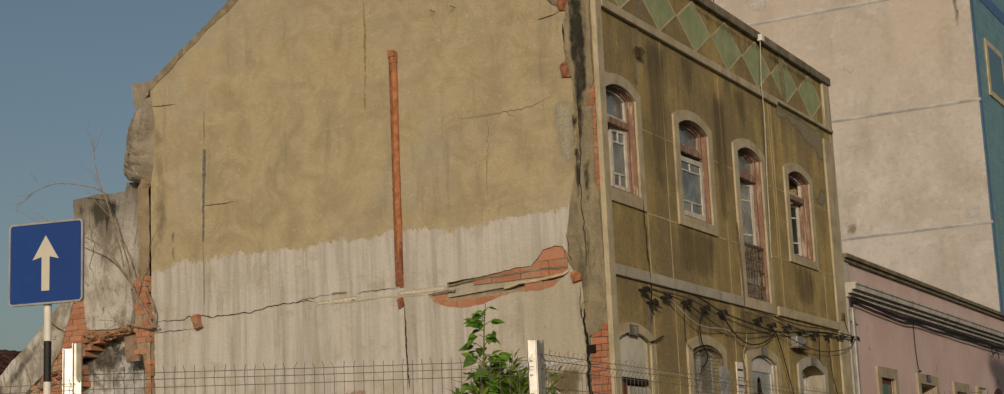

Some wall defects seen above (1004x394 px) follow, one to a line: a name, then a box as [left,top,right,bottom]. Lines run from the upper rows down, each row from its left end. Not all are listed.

flaking render [306,246,569,309]